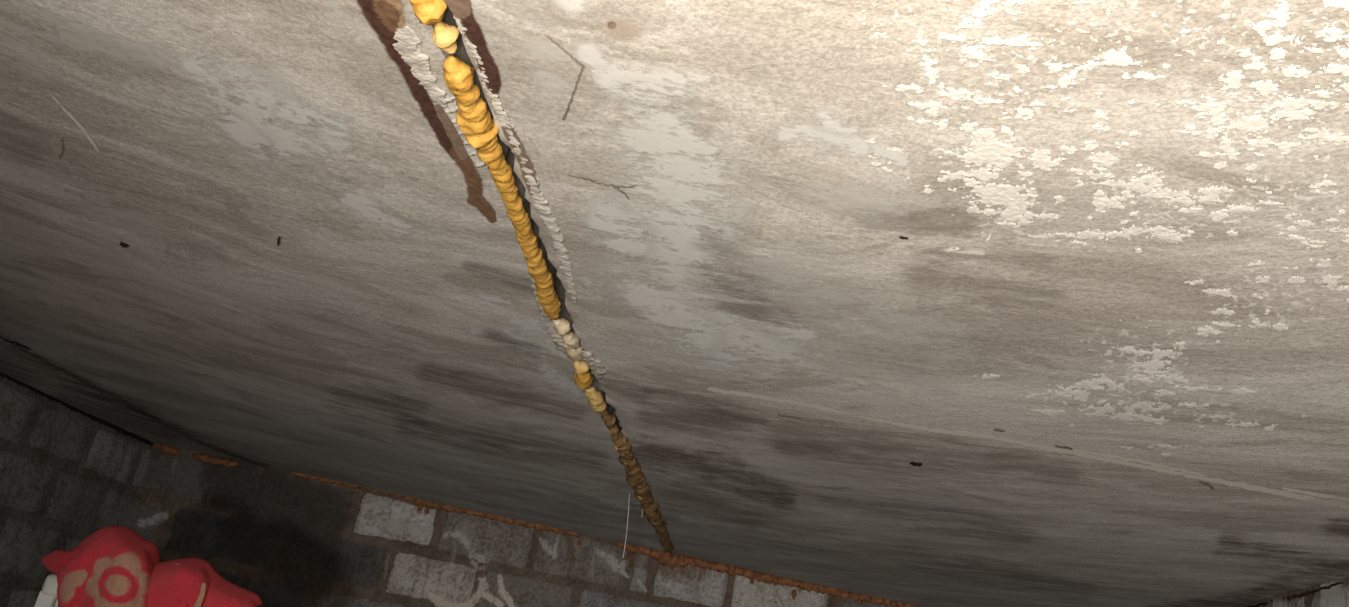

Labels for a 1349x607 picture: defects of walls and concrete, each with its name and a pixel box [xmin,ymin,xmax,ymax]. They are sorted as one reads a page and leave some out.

rust [357,0,501,223]
crack [544,34,584,120]
crack [567,174,639,199]